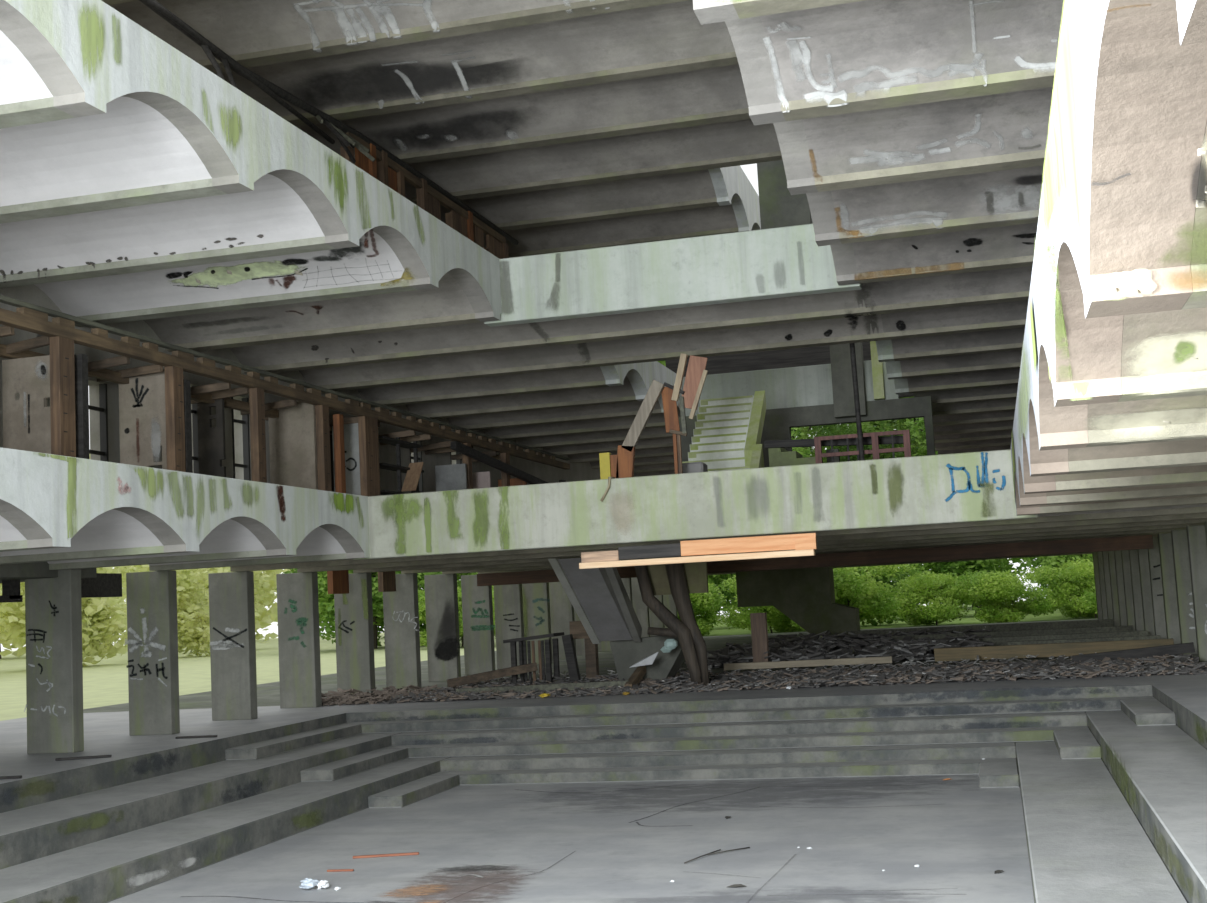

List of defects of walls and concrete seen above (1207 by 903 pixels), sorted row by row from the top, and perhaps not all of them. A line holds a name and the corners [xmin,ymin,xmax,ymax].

damp [382,61,424,104]
damp [444,50,472,99]
damp [1192,163,1207,204]
spalling [166,239,364,289]
damp [394,494,406,554]
damp [424,498,432,552]
damp [443,490,461,538]
damp [499,486,509,549]
damp [435,638,460,661]